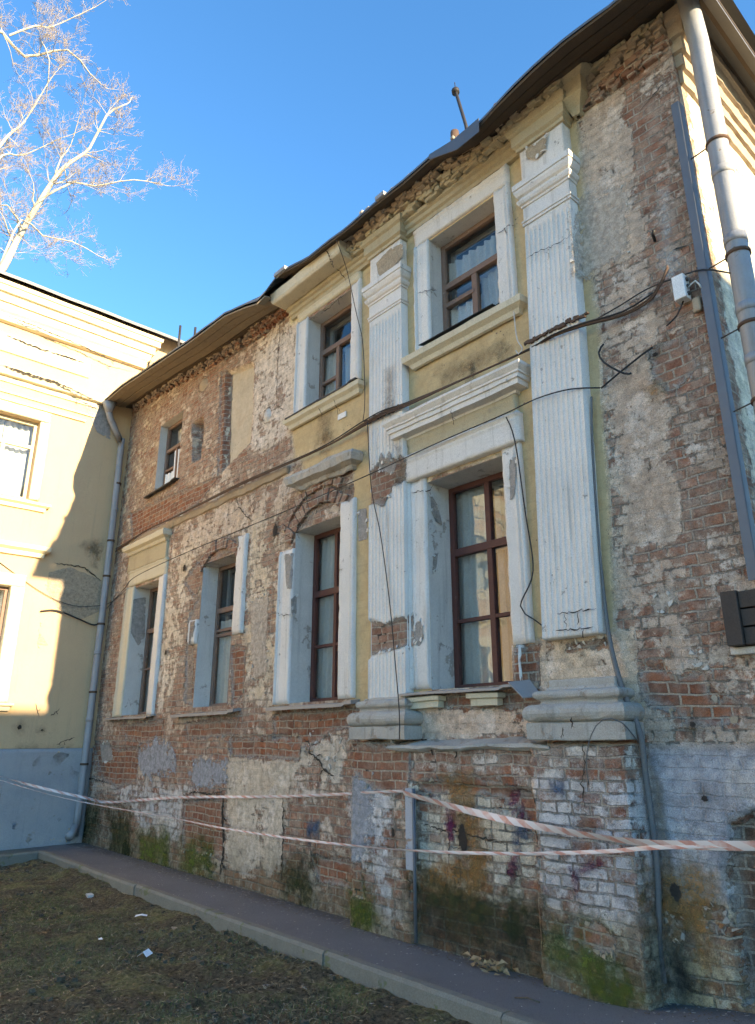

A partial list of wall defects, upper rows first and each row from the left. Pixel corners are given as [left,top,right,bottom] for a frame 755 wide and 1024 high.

spalling [582,11,673,113]
peeling [566,184,630,280]
spalling [645,328,698,394]
spalling [130,308,289,539]
spalling [298,452,407,541]
peeling [507,457,516,500]
spalling [371,614,424,655]
peeling [651,586,677,616]
spalling [93,706,351,861]
crack [304,739,335,780]
crack [182,791,227,879]